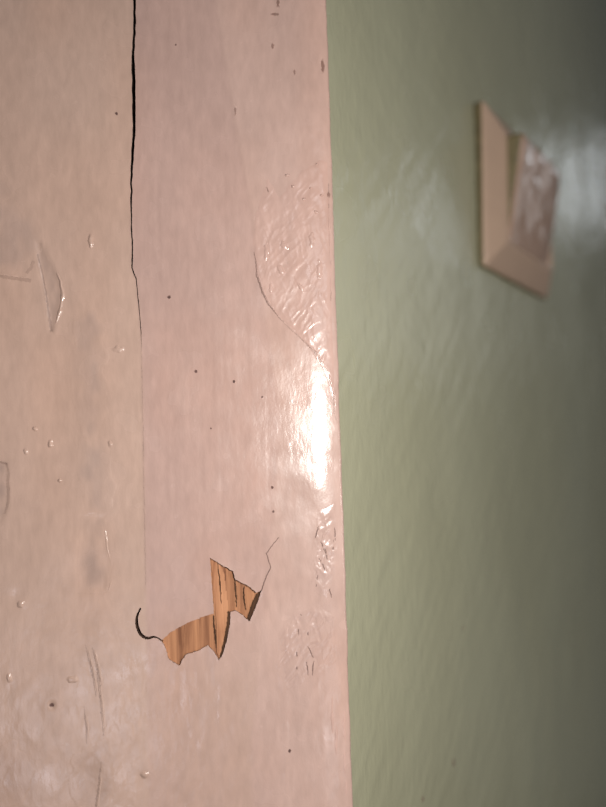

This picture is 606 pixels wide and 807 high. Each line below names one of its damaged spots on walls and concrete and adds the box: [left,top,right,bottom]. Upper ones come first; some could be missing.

crack [130,0,141,330]
peeling [135,558,261,665]